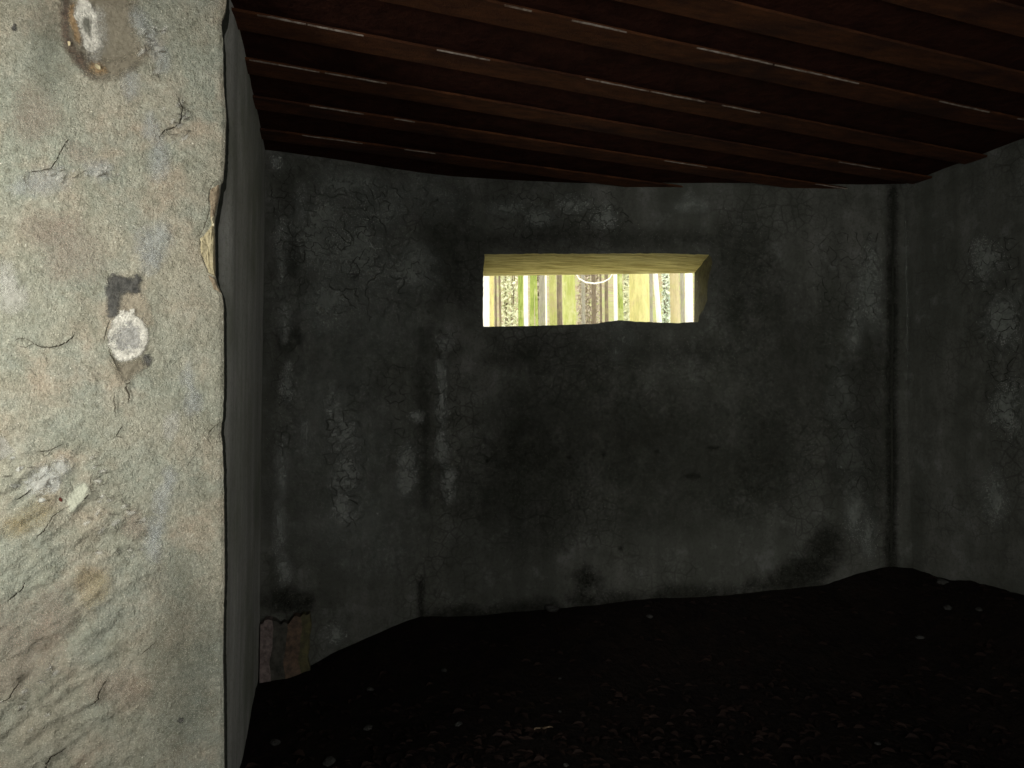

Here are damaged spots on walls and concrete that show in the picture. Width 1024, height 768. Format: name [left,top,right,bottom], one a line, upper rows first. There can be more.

crack [159,95,193,137]
crack [24,140,87,186]
spalling [200,184,221,293]
crack [288,178,457,322]
crack [15,333,75,348]
leakage [107,293,150,382]